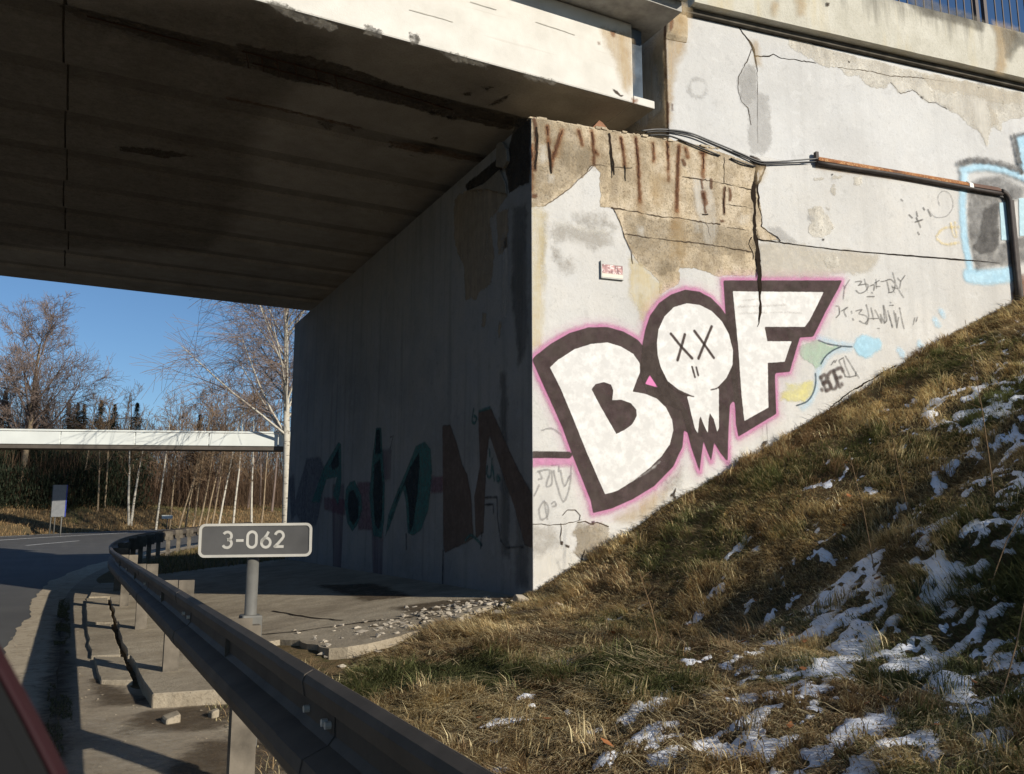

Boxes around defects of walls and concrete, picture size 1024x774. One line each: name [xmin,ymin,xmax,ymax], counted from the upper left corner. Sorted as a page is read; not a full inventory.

flaking render [789,38,1024,146]
spalling [60,5,877,294]
rust [531,117,563,176]
rust [578,130,642,202]
rust [652,141,732,222]
crack [611,28,995,327]